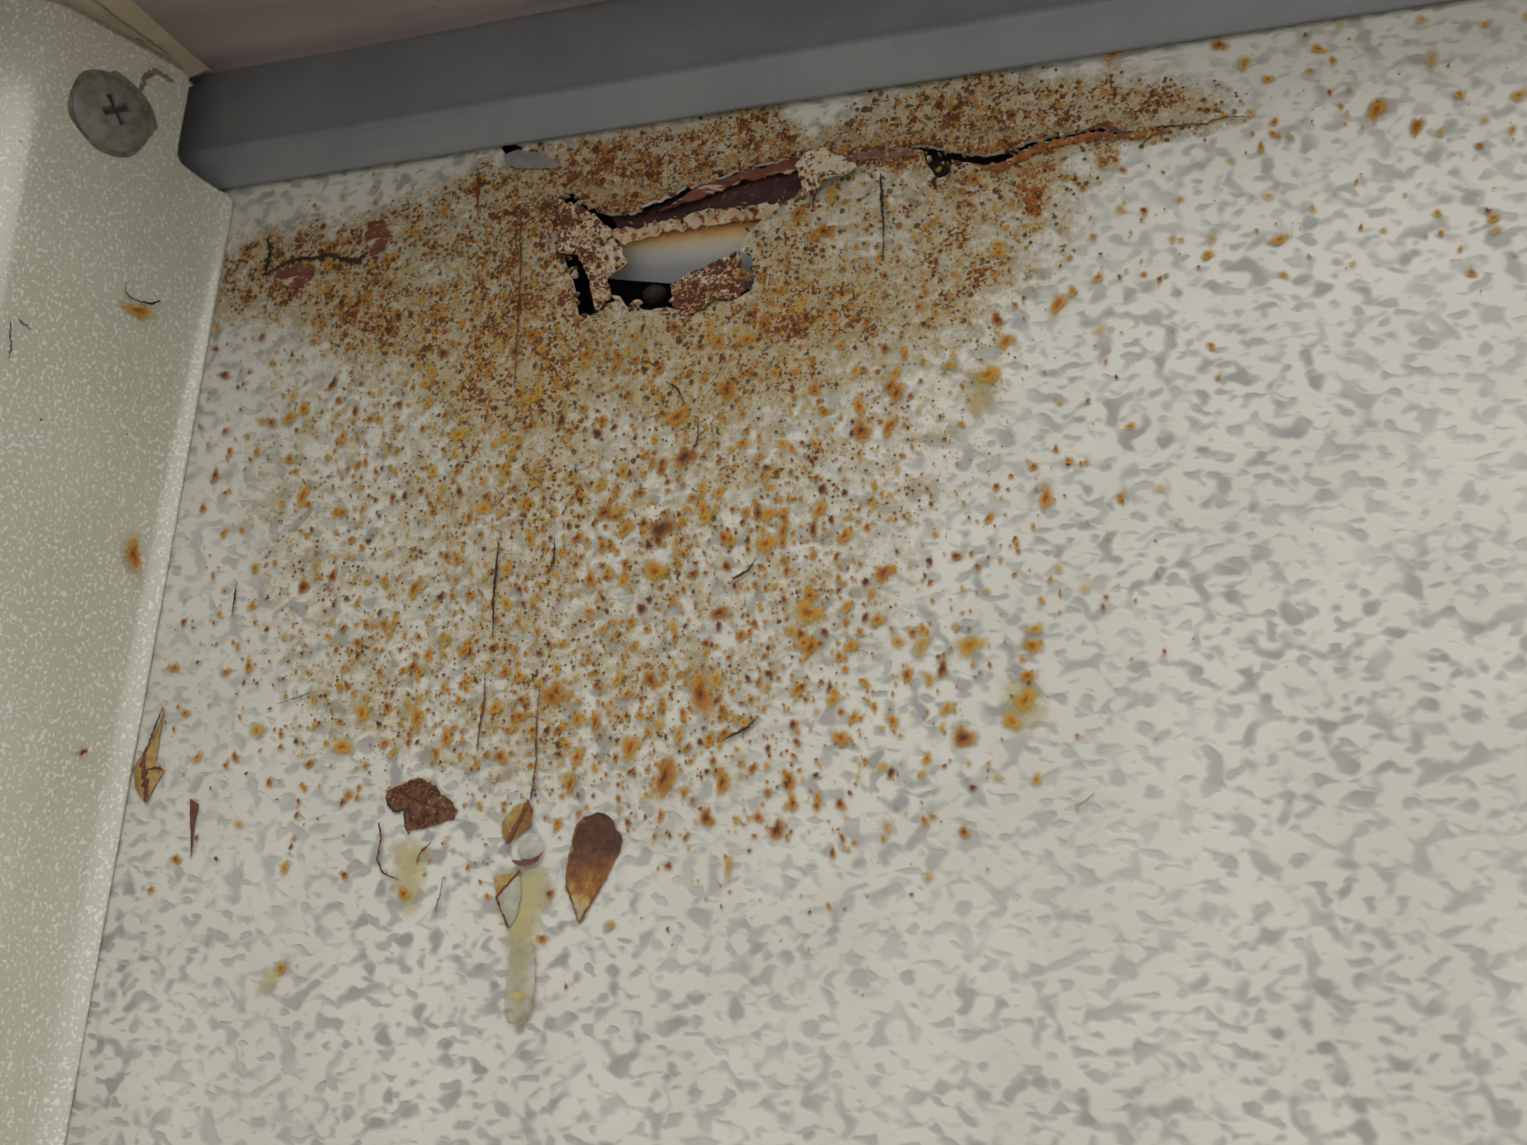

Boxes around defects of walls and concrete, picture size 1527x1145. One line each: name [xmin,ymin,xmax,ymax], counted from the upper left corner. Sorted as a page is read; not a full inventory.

rust [1303,32,1386,128]
rust [1410,118,1443,136]
spalling [564,194,616,230]
crack [805,116,1249,261]
rust [1254,204,1316,244]
rust [1485,208,1502,234]
spalling [565,254,677,315]
rust [175,51,1291,908]
peeling [133,707,165,804]
spalling [385,776,457,835]
peeling [502,799,531,845]
spalling [565,812,622,924]